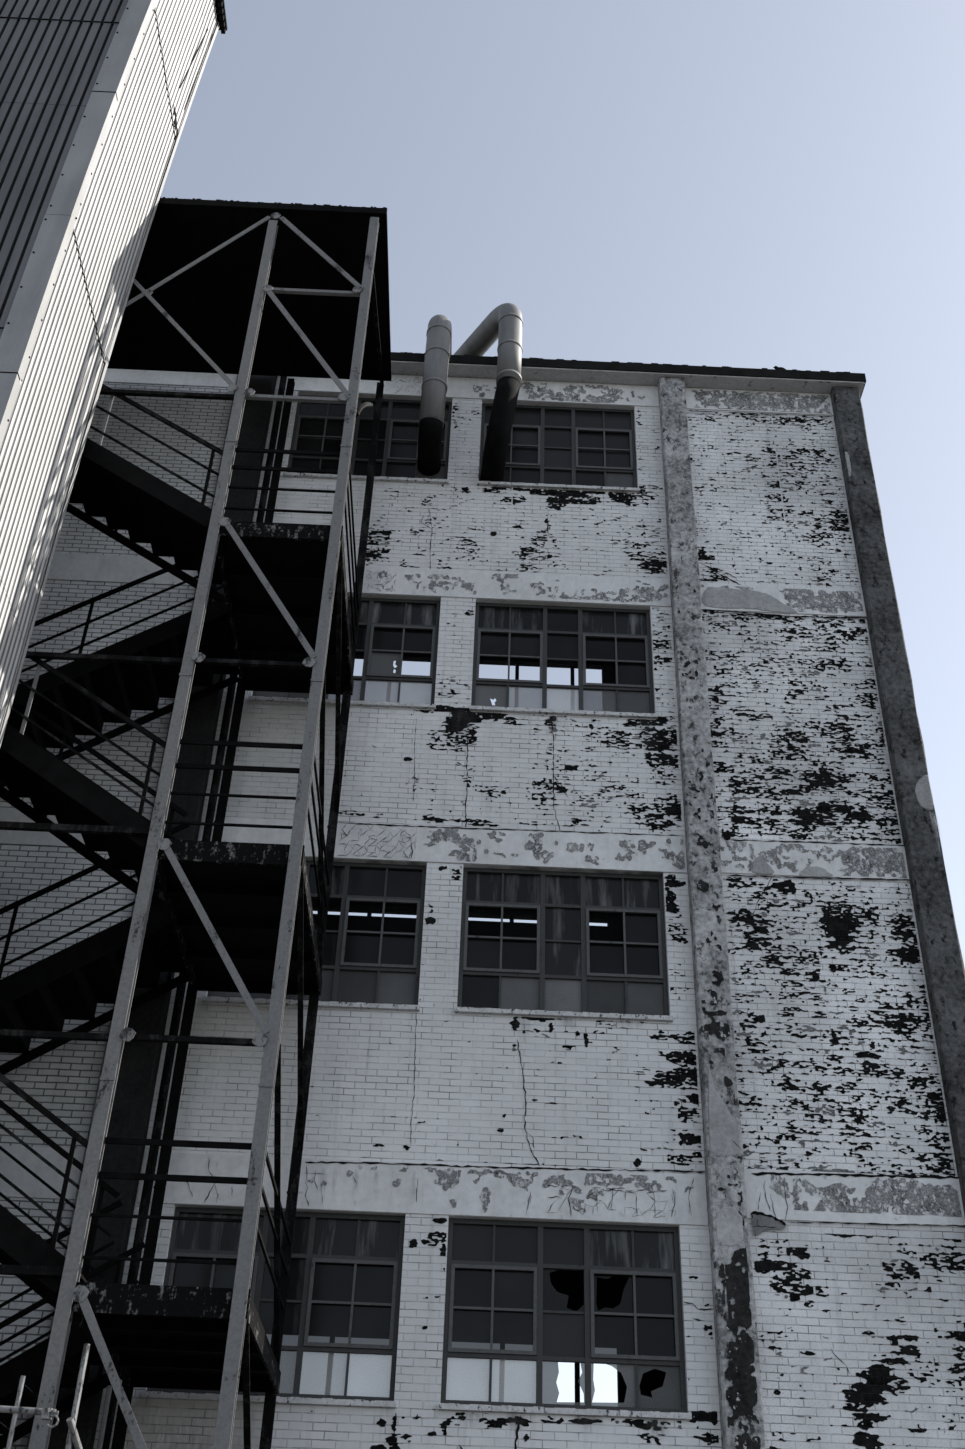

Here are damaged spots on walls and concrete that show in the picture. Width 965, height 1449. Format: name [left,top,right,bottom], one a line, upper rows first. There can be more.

peeling [366,382,965,1449]
crack [305,1013,965,1227]
crack [390,1413,398,1449]
crack [514,1416,522,1449]